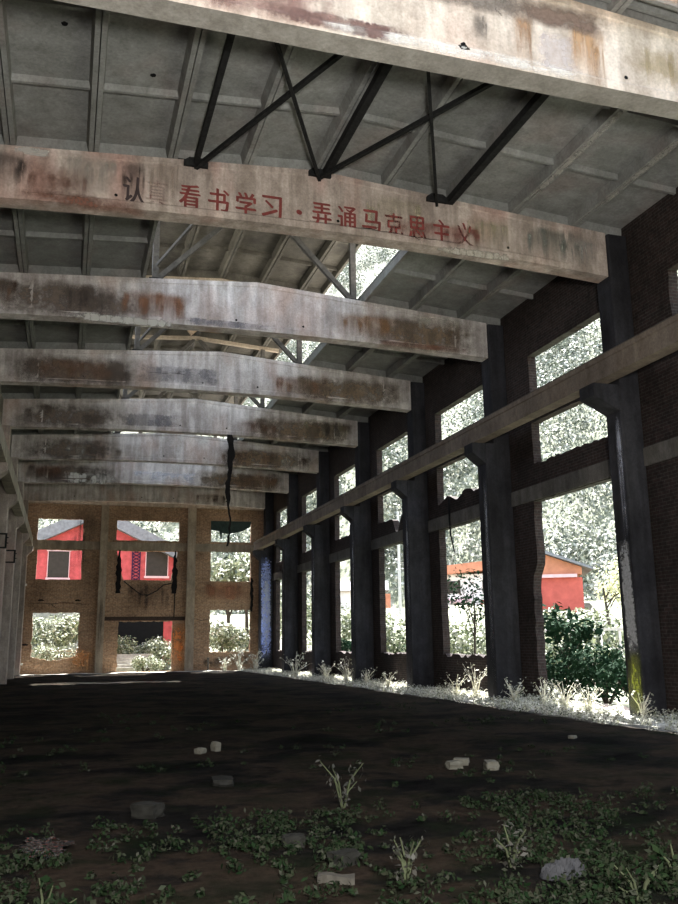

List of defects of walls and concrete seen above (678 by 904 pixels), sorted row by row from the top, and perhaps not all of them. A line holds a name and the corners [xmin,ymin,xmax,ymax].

leakage [16,147,49,173]
corrosion [124,294,184,311]